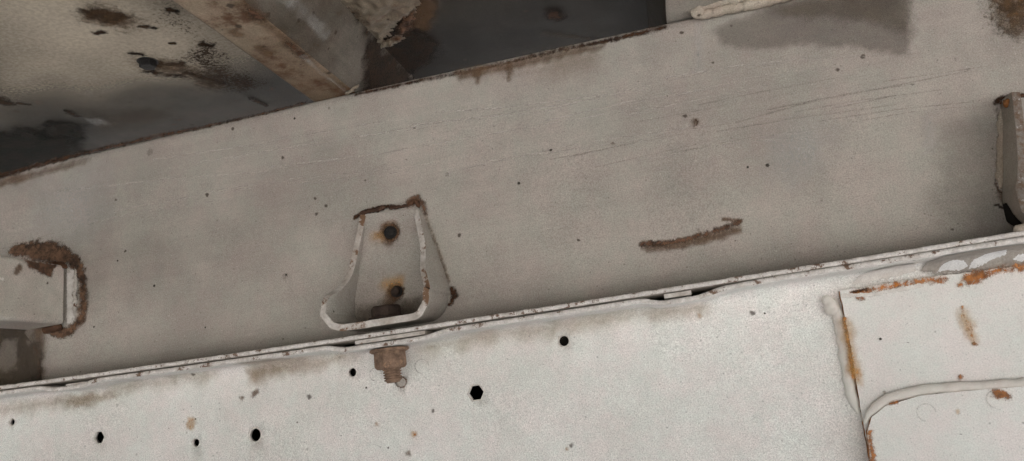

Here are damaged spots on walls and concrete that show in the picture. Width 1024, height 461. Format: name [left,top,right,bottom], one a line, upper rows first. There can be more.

water stain [0,121,84,173]
rust [353,194,427,220]
rust [639,218,743,251]
rust [435,240,459,306]
rust [841,263,1024,301]
rust [8,239,89,381]
rust [843,317,855,379]
rust [992,389,1012,401]
rust [867,430,876,461]